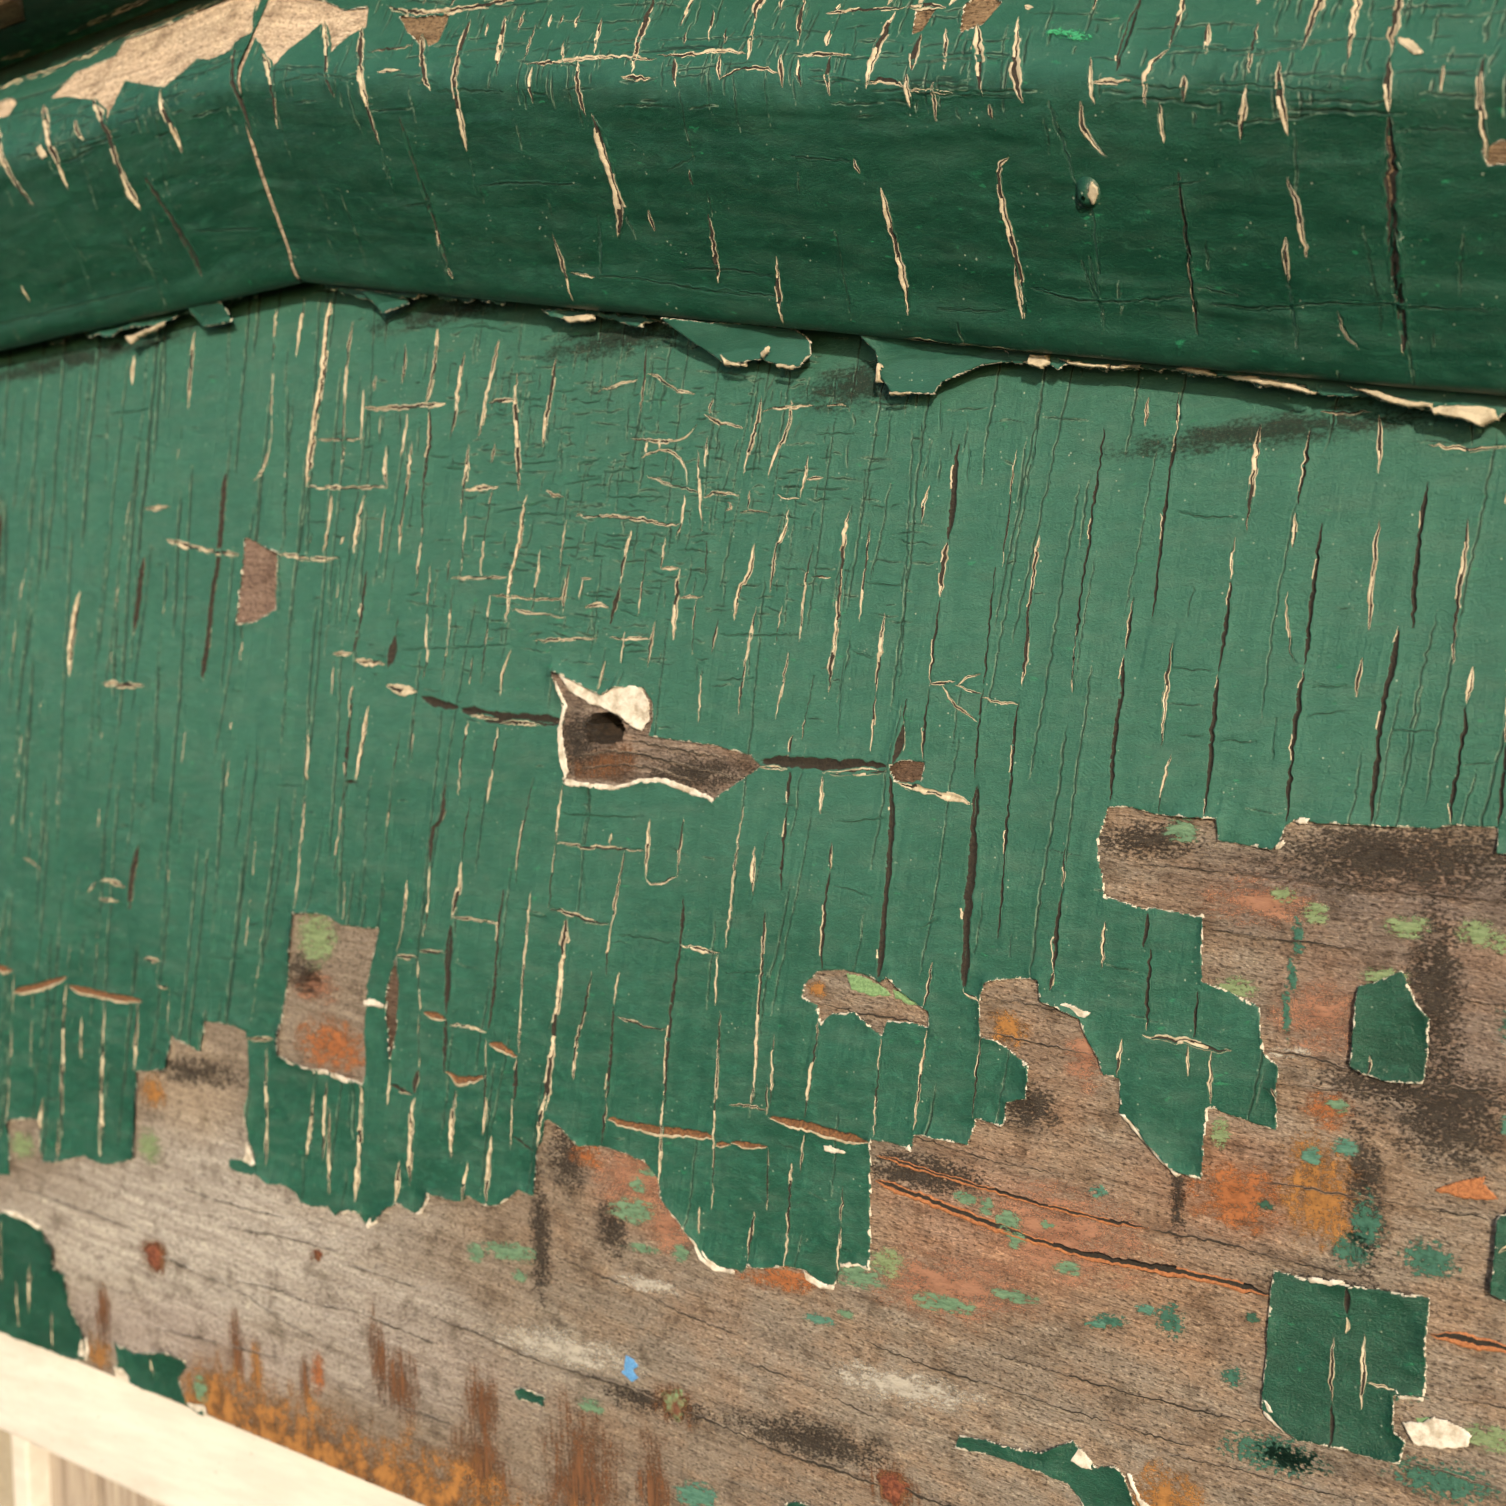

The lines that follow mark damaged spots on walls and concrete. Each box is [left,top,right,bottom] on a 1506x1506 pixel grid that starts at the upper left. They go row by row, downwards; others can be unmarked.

crack [0,89,203,277]
peeling [0,0,368,122]
crack [227,47,278,161]
crack [321,0,1503,353]
peeling [235,538,278,624]
crack [1071,425,1106,693]
crack [1107,393,1506,829]
crack [0,255,1051,1267]
peeling [552,671,760,802]
crack [1048,847,1067,991]
crack [1099,913,1230,1104]
peeling [0,807,1506,1506]